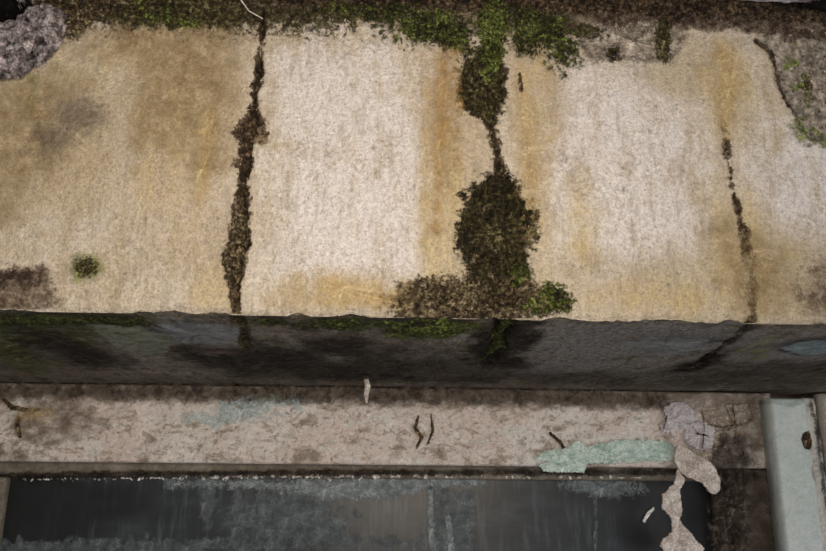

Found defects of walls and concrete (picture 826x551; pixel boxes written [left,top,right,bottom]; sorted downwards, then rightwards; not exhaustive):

spalling [0,0,130,82]
flaking render [754,27,826,148]
crack [220,13,270,350]
crack [378,0,578,370]
damp [0,264,67,309]
crack [670,122,760,373]
damp [796,265,826,323]
damp [0,328,826,413]
peeling [113,474,401,482]
peeling [535,401,751,551]